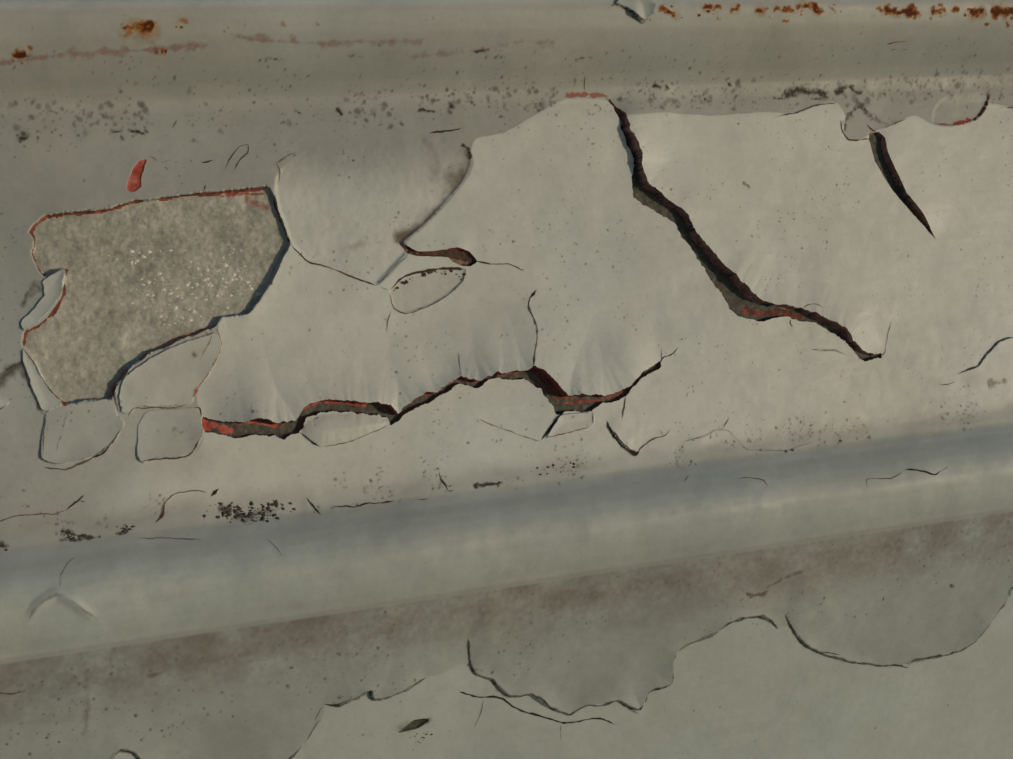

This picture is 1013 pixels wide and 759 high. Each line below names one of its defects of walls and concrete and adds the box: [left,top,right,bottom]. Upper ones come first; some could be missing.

rust [122,20,155,36]
rust [698,4,740,20]
rust [755,2,835,22]
rust [876,3,1013,27]
crack [780,103,936,240]
crack [584,78,891,362]
crack [400,243,521,270]
peeling [21,128,472,470]
crack [202,291,678,456]
peeling [679,615,975,668]
peeling [467,640,674,716]
spalling [398,718,433,750]